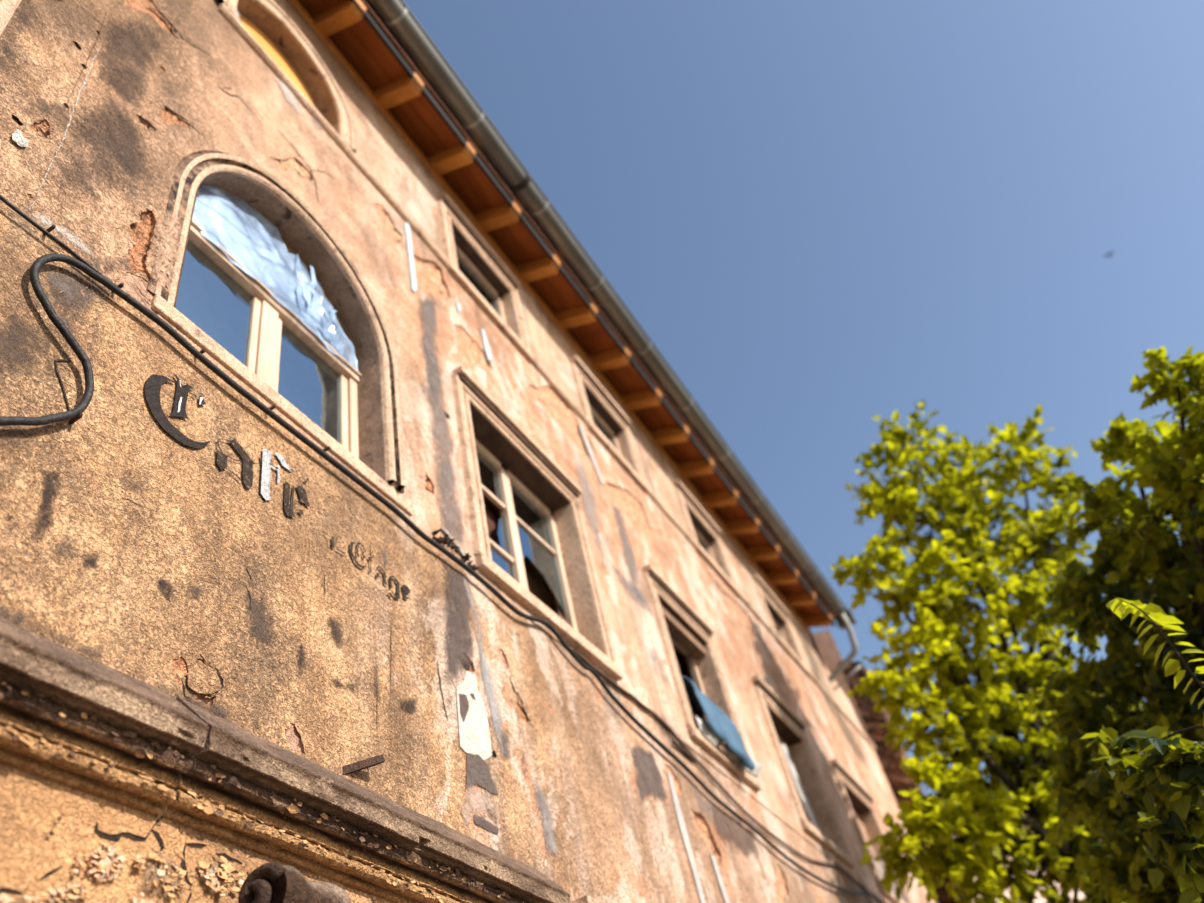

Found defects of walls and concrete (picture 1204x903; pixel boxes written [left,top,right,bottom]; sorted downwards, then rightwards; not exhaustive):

spalling [11,114,53,139]
spalling [114,208,185,315]
peeling [81,713,192,764]
spalling [173,656,211,684]
crack [181,653,228,708]
spalling [192,693,217,710]
peeling [456,663,497,760]
water stain [444,563,525,761]
spalling [512,687,530,724]
water stain [632,746,667,800]
peeling [0,721,525,903]
crack [94,814,250,903]